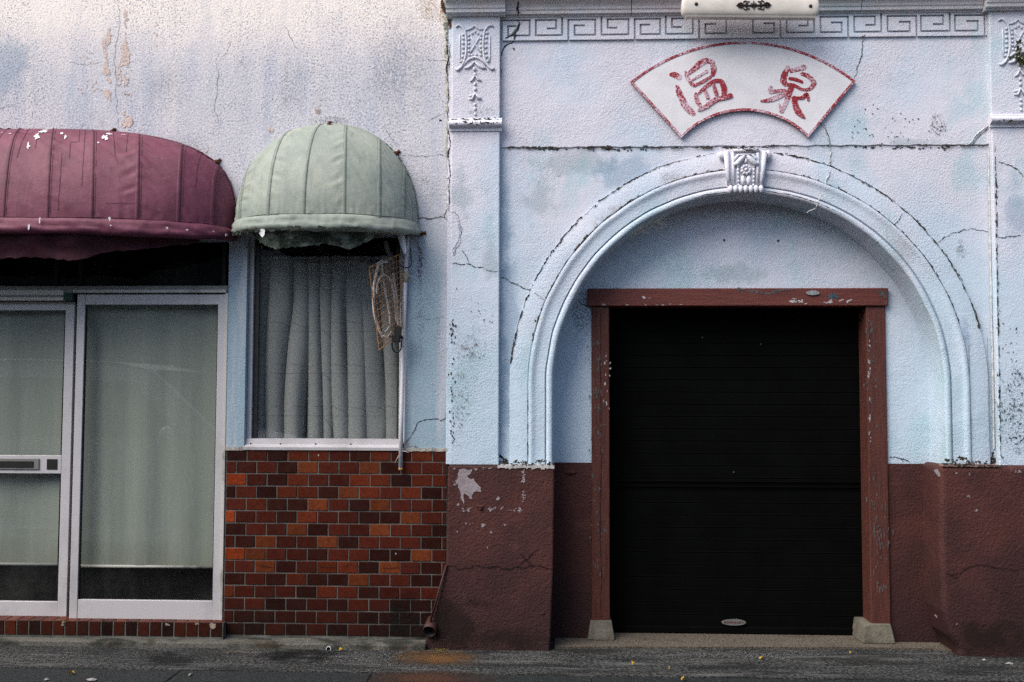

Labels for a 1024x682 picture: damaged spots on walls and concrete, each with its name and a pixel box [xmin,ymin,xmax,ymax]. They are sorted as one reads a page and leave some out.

peeling [77,9,131,101]
crack [767,123,841,214]
crack [421,210,545,301]
crack [939,124,1024,453]
leakage [992,359,1024,452]
peeling [488,393,529,512]
peeling [453,467,492,534]
crack [447,549,552,570]